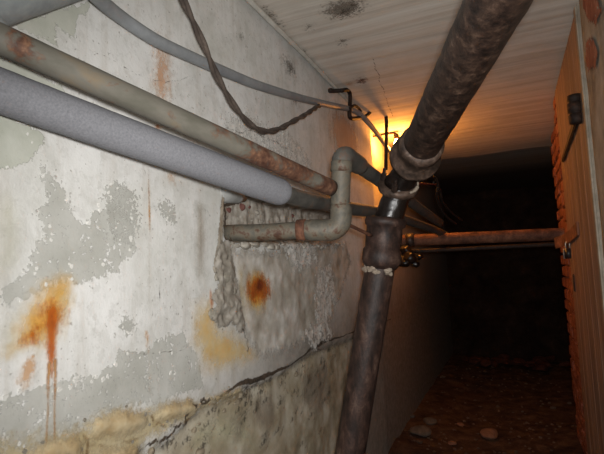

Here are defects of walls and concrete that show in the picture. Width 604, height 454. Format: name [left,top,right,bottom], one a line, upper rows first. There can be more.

water stain [324,0,363,20]
peeling [0,116,45,170]
peeling [0,164,143,305]
corrosion [20,284,66,393]
peeling [0,332,204,454]
water stain [43,397,229,454]
water stain [199,312,244,363]
flaking render [141,187,353,454]
crack [146,332,354,447]
corrosion [247,275,270,307]